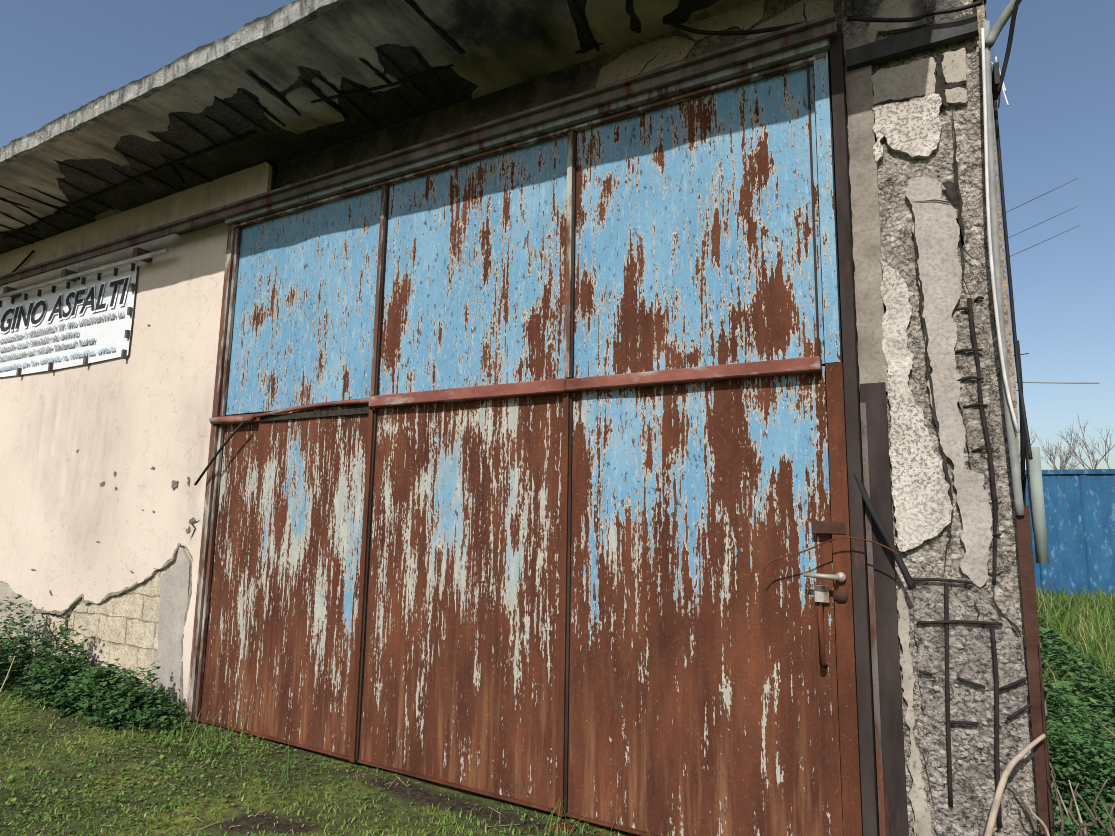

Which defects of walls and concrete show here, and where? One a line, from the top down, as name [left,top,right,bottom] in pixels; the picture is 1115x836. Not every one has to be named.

spalling [0,0,478,254]
peeling [871,48,968,164]
flaking render [0,517,195,716]
spalling [880,176,1056,836]